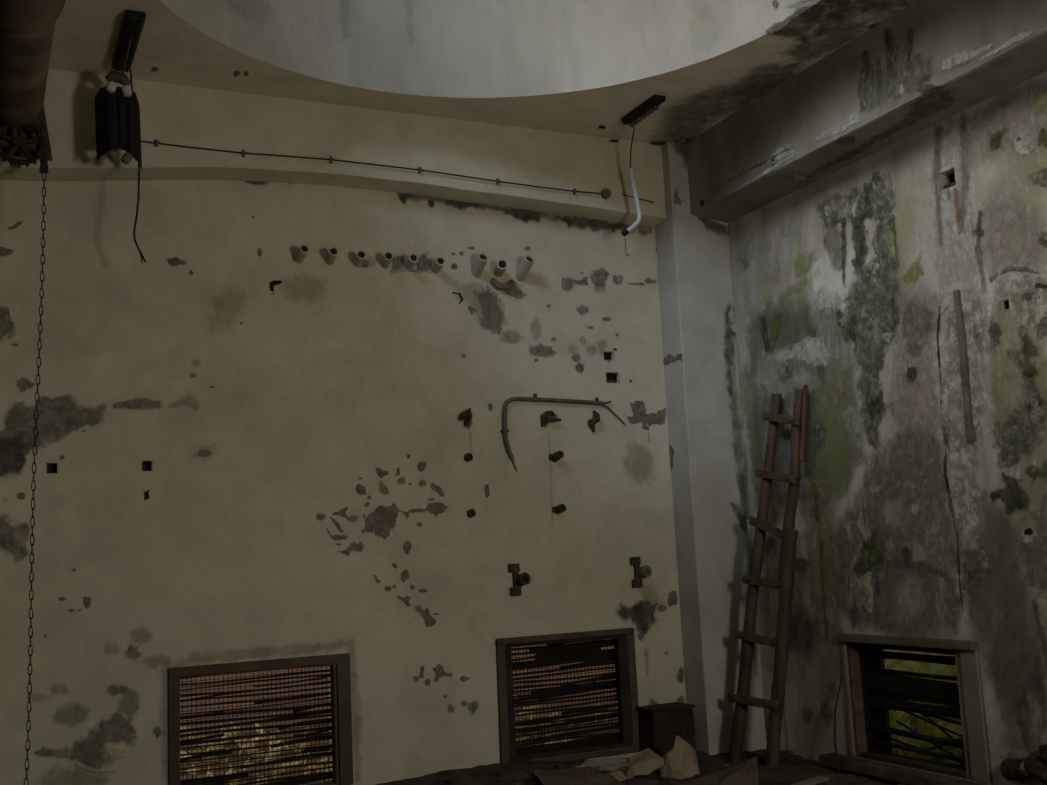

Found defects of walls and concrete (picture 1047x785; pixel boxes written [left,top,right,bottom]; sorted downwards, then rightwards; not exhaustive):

leakage [650,0,1037,295]
leakage [397,193,652,235]
peeling [453,283,525,343]
peeling [627,401,666,430]
spalling [46,462,57,473]
crack [937,306,963,610]
peeling [317,454,448,556]
leakage [724,287,1047,755]
peeling [374,563,439,627]
peeling [414,664,471,686]
peeling [444,695,478,713]